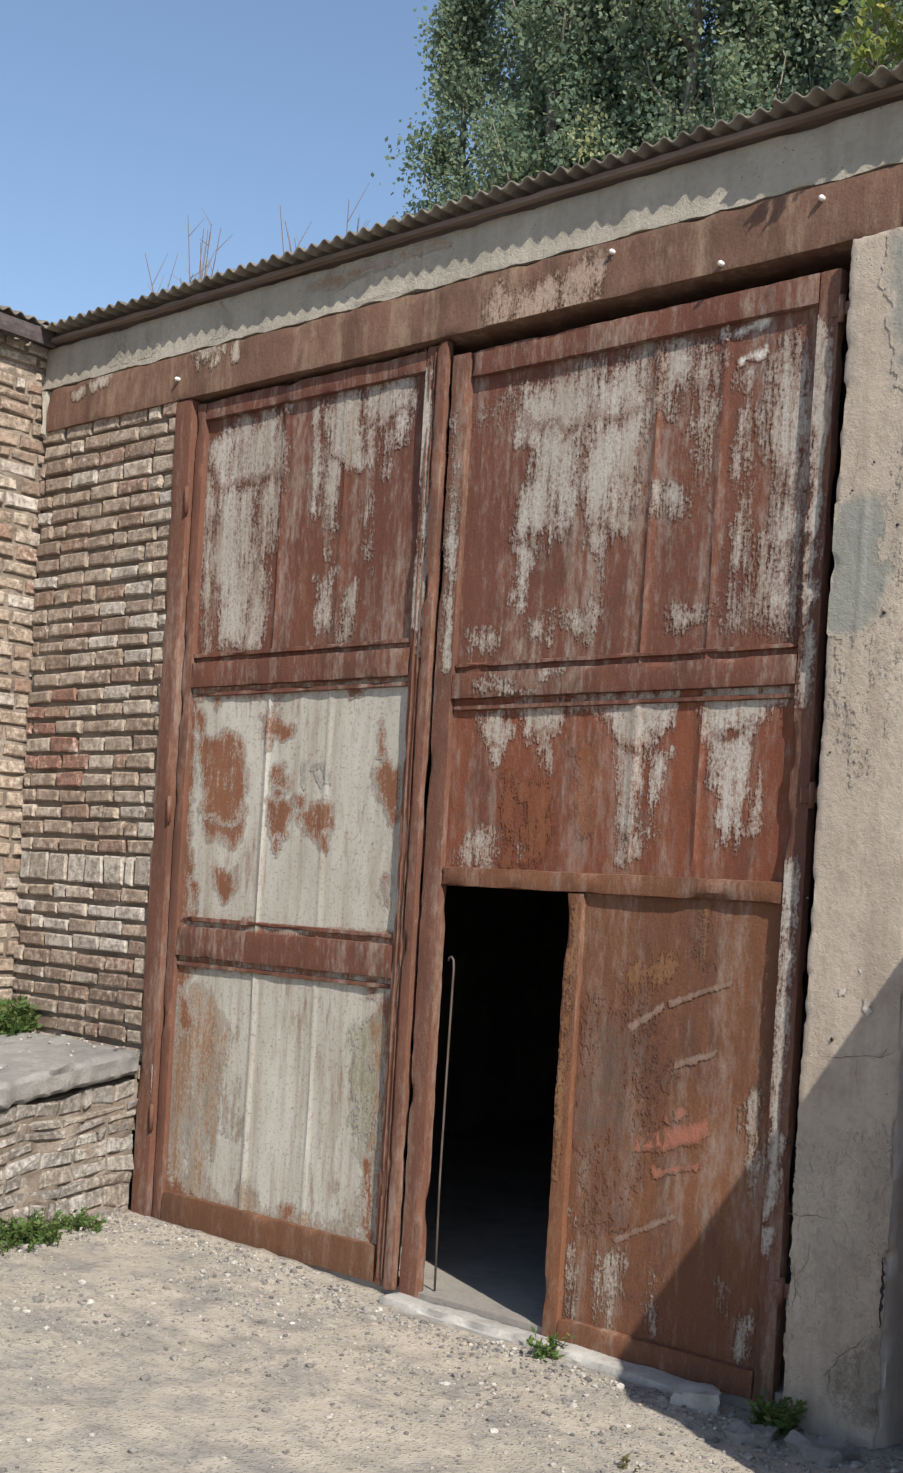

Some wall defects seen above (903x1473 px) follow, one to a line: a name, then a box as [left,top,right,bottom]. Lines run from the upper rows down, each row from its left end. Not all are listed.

peeling [198,314,835,871]
water stain [829,435,903,787]
corrosion [181,676,409,945]
corrosion [166,955,391,1244]
corrosion [552,901,581,1181]